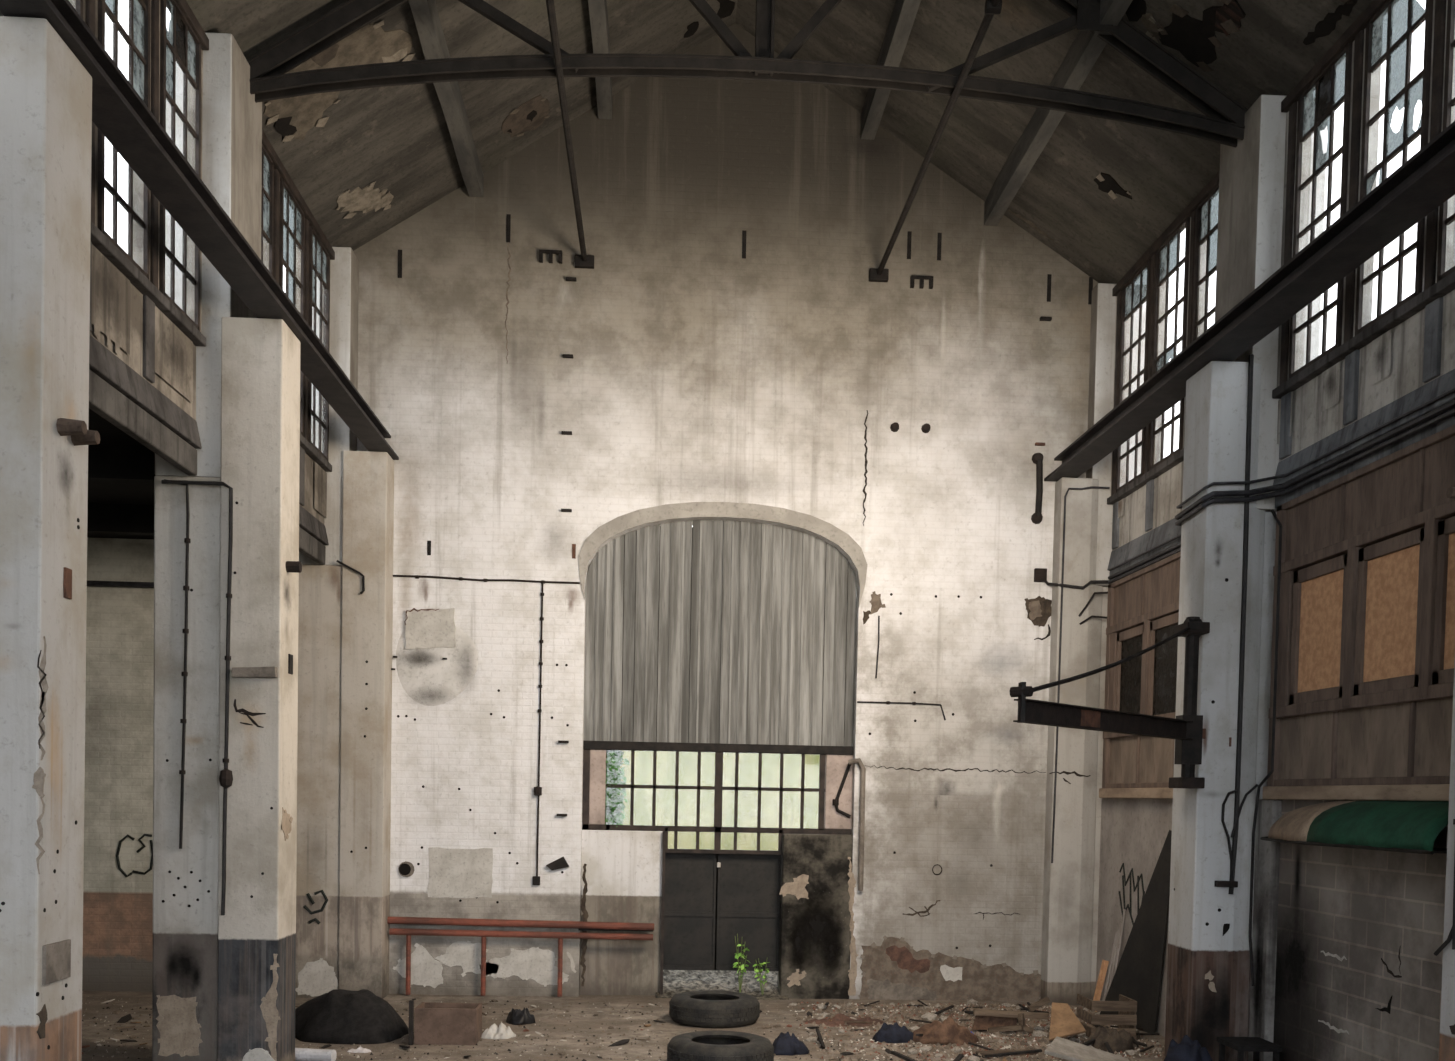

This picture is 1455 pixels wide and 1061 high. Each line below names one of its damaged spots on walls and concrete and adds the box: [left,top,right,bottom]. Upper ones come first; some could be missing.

flaking render [336,181,394,219]
crack [861,410,869,526]
leakage [791,898,839,971]
flaking render [848,857,1041,1002]
peeling [156,995,202,1057]